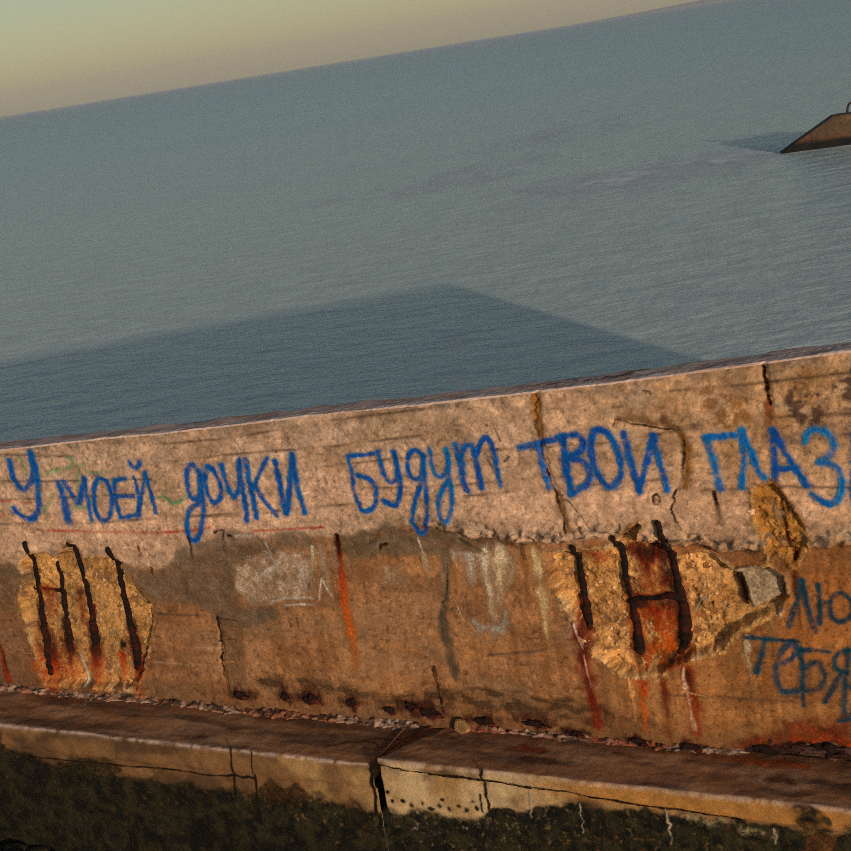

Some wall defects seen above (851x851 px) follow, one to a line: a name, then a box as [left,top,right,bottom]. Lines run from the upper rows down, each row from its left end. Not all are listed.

crack [531,393,590,534]
peeling [613,415,693,523]
corrosion [34,607,75,680]
spalling [16,541,156,694]
corrosion [78,590,103,679]
corrosion [119,624,144,685]
water stain [134,523,550,679]
corrosion [334,534,356,660]
corrosion [626,542,704,754]
spalling [543,479,812,680]
crack [324,695,741,820]
corrosion [726,720,851,785]